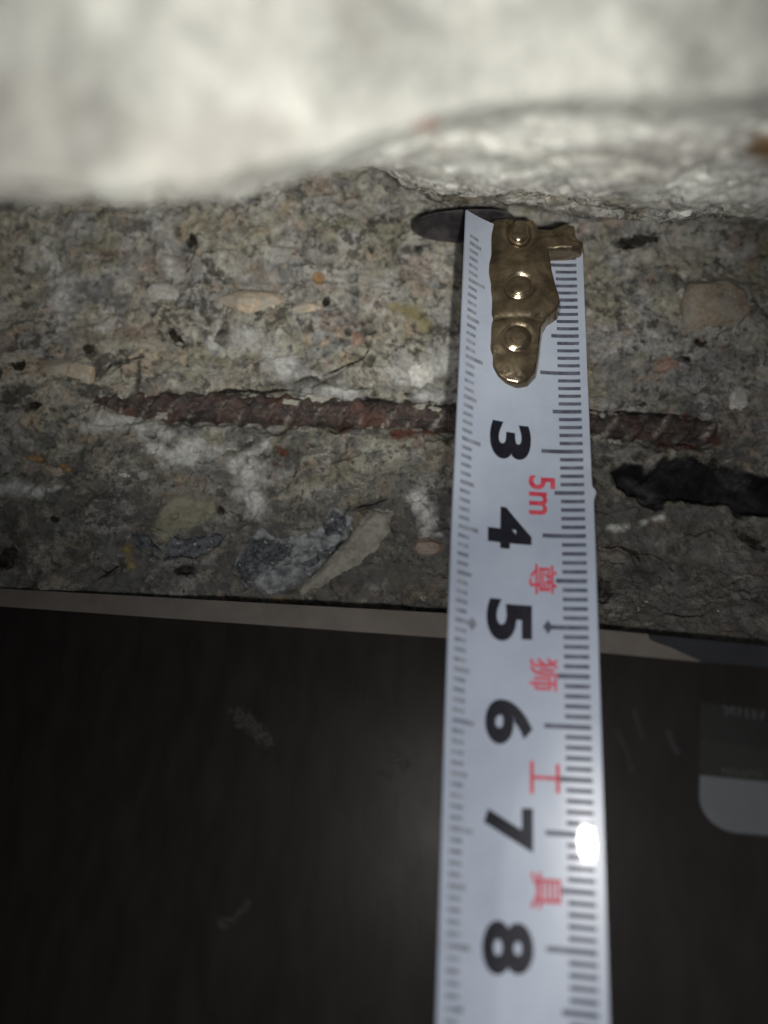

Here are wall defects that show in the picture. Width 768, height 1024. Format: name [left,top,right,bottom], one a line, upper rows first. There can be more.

spalling [0,165,768,646]
corrosion [390,429,437,439]